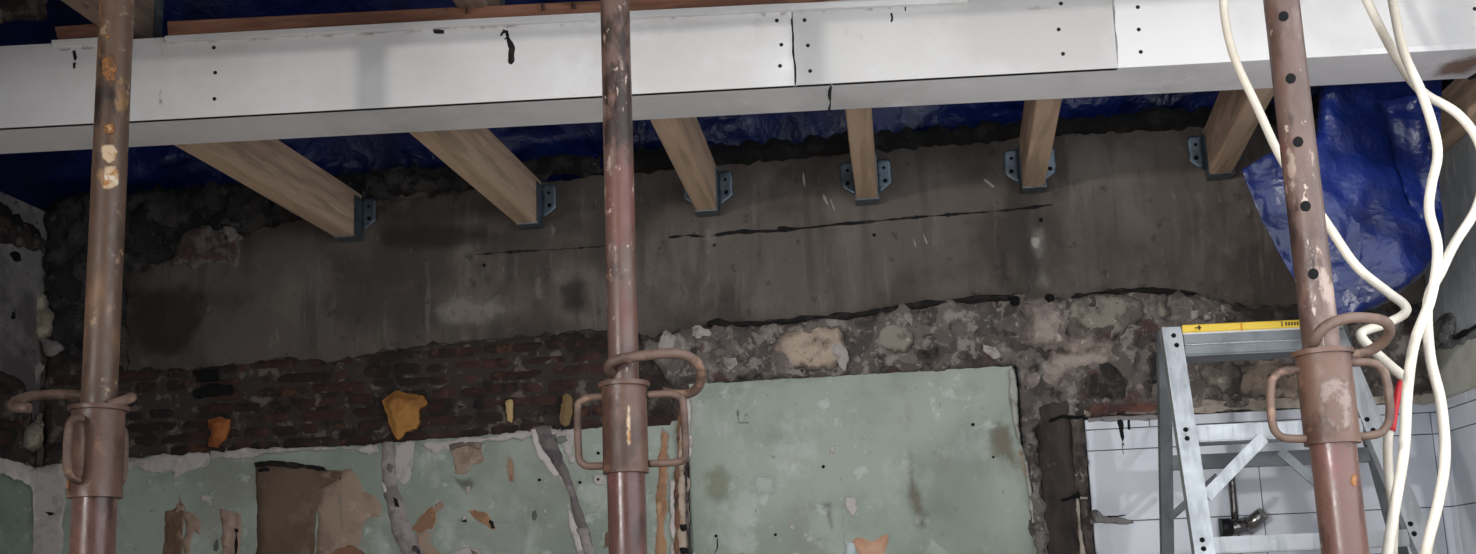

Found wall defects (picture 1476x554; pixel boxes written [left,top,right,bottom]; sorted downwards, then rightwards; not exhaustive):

crack [476,246,603,255]
crack [669,204,1053,238]
flaking render [0,123,612,554]
spalling [1347,303,1436,405]
spalling [626,290,1300,554]